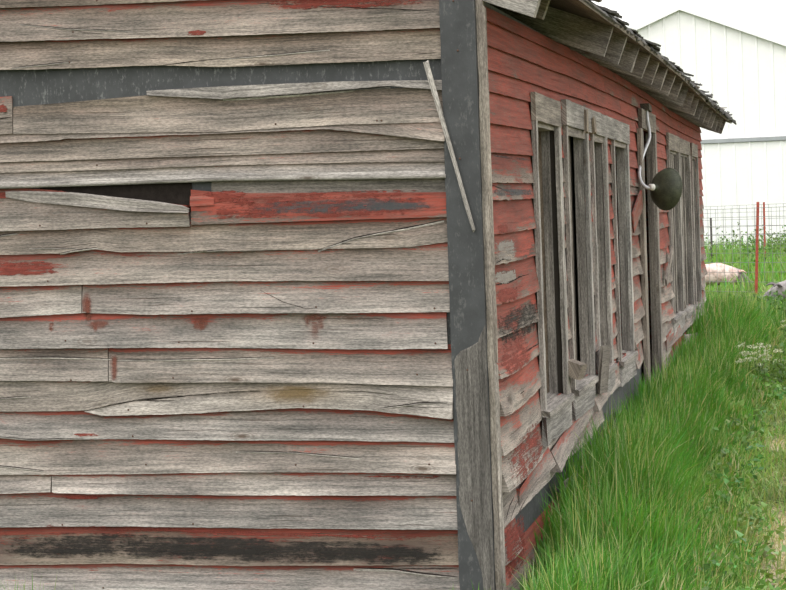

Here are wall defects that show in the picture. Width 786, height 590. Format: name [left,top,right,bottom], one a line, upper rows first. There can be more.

peeling [203,190,424,219]
crack [318,220,444,252]
peeling [495,269,518,303]
crack [91,390,260,410]
leakage [4,533,444,565]